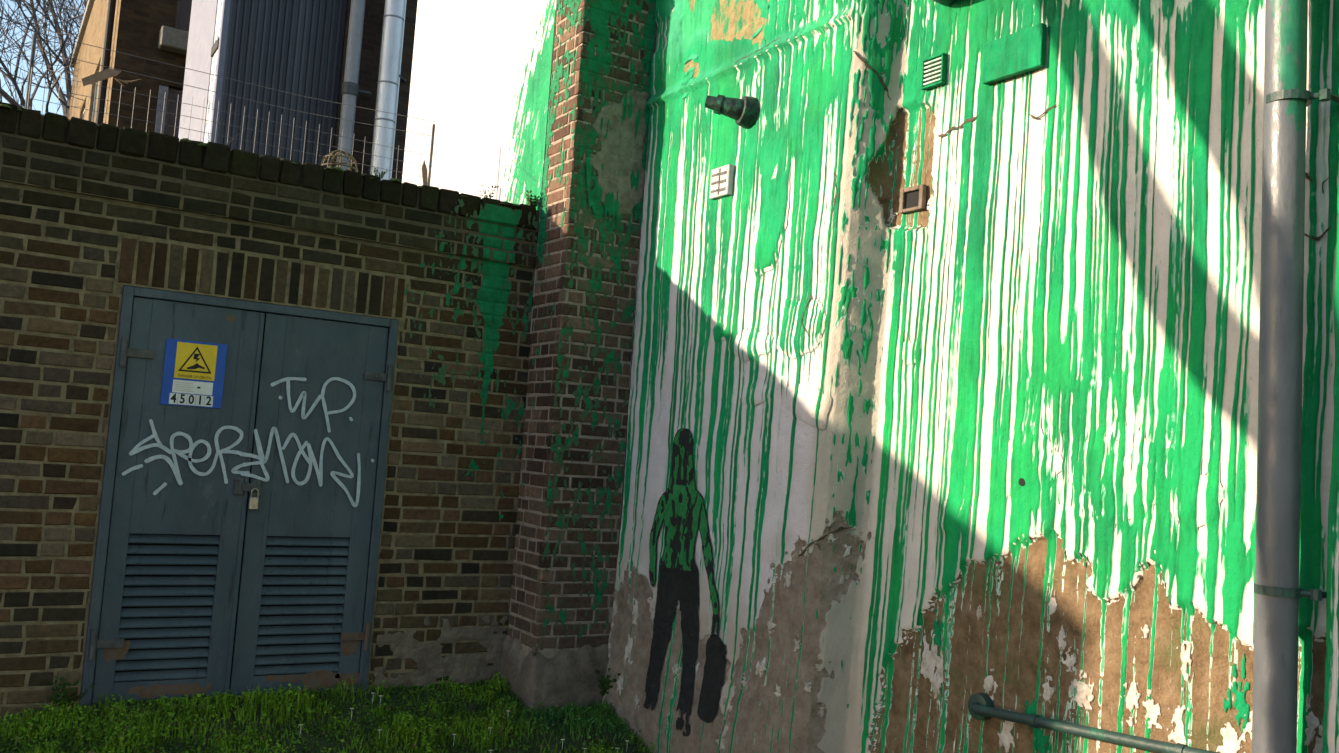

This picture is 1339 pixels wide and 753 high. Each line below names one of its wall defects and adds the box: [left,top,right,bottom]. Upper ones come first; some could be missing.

peeling [681,53,699,99]
peeling [710,0,769,48]
spalling [867,104,936,230]
spalling [604,510,872,753]
spalling [868,530,1254,753]
spalling [1297,633,1327,753]